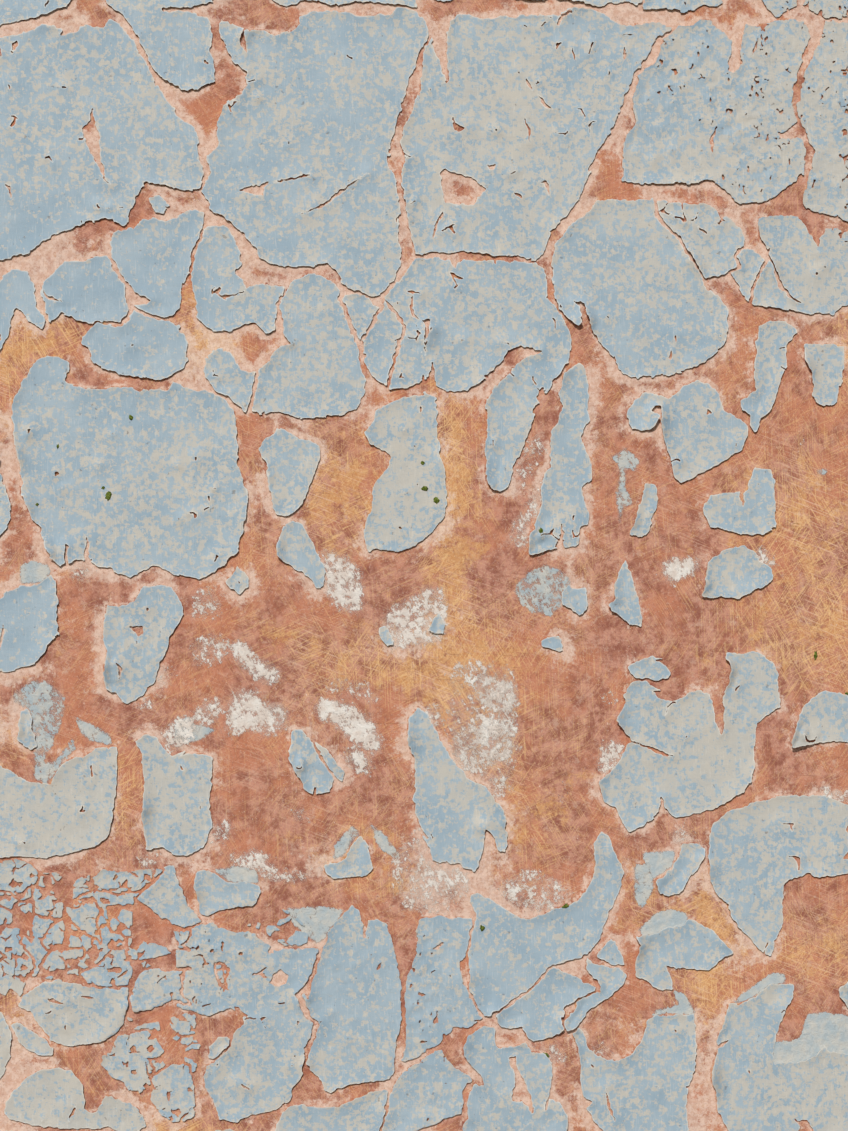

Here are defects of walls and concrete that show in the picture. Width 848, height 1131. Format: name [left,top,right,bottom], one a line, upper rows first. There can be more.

peeling [0,19,204,260]
peeling [106,0,672,340]
peeling [572,0,848,222]
peeling [0,209,366,579]
leakage [161,634,287,754]
leakage [318,549,364,613]
leakage [317,679,383,777]
leakage [386,587,448,650]
leakage [425,659,523,797]
peeling [208,198,848,1131]
peeling [0,575,536,1131]
crack [0,906,556,1131]